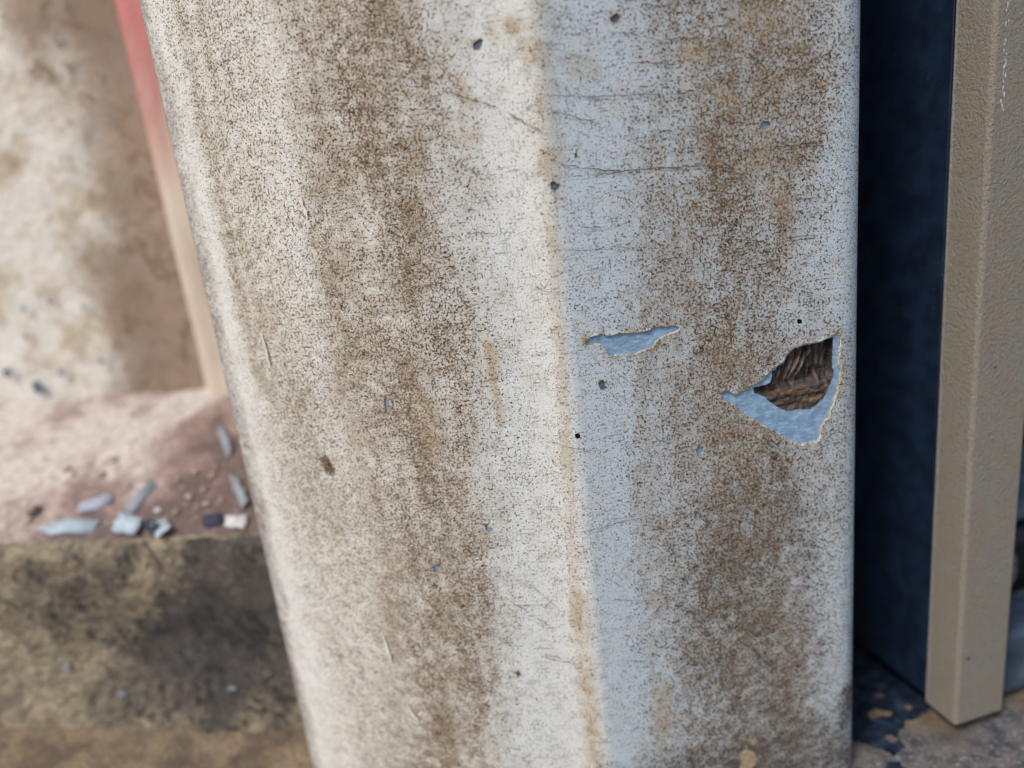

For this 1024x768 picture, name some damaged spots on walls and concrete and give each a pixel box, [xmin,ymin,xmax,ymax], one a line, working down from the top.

damp [140,0,532,768]
peeling [583,323,681,360]
damp [611,0,856,768]
peeling [719,326,843,448]